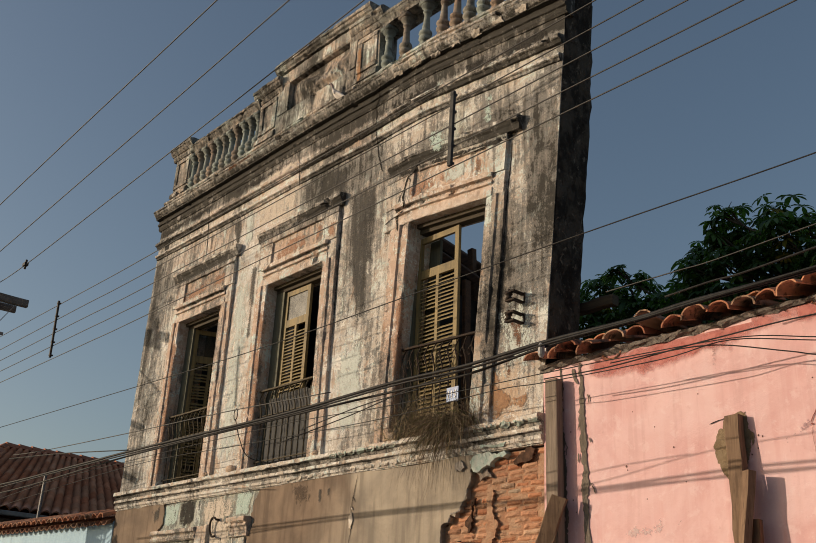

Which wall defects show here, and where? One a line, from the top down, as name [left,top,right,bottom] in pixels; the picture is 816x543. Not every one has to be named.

damp [466,30,547,74]
damp [392,80,440,119]
damp [301,130,369,173]
damp [388,113,523,179]
peeling [409,163,464,199]
damp [257,166,375,329]
peeling [219,283,265,460]
spalling [713,421,729,479]
spalling [735,411,763,464]
peeling [164,503,180,526]
peeling [203,492,253,543]
flaking render [440,442,545,543]